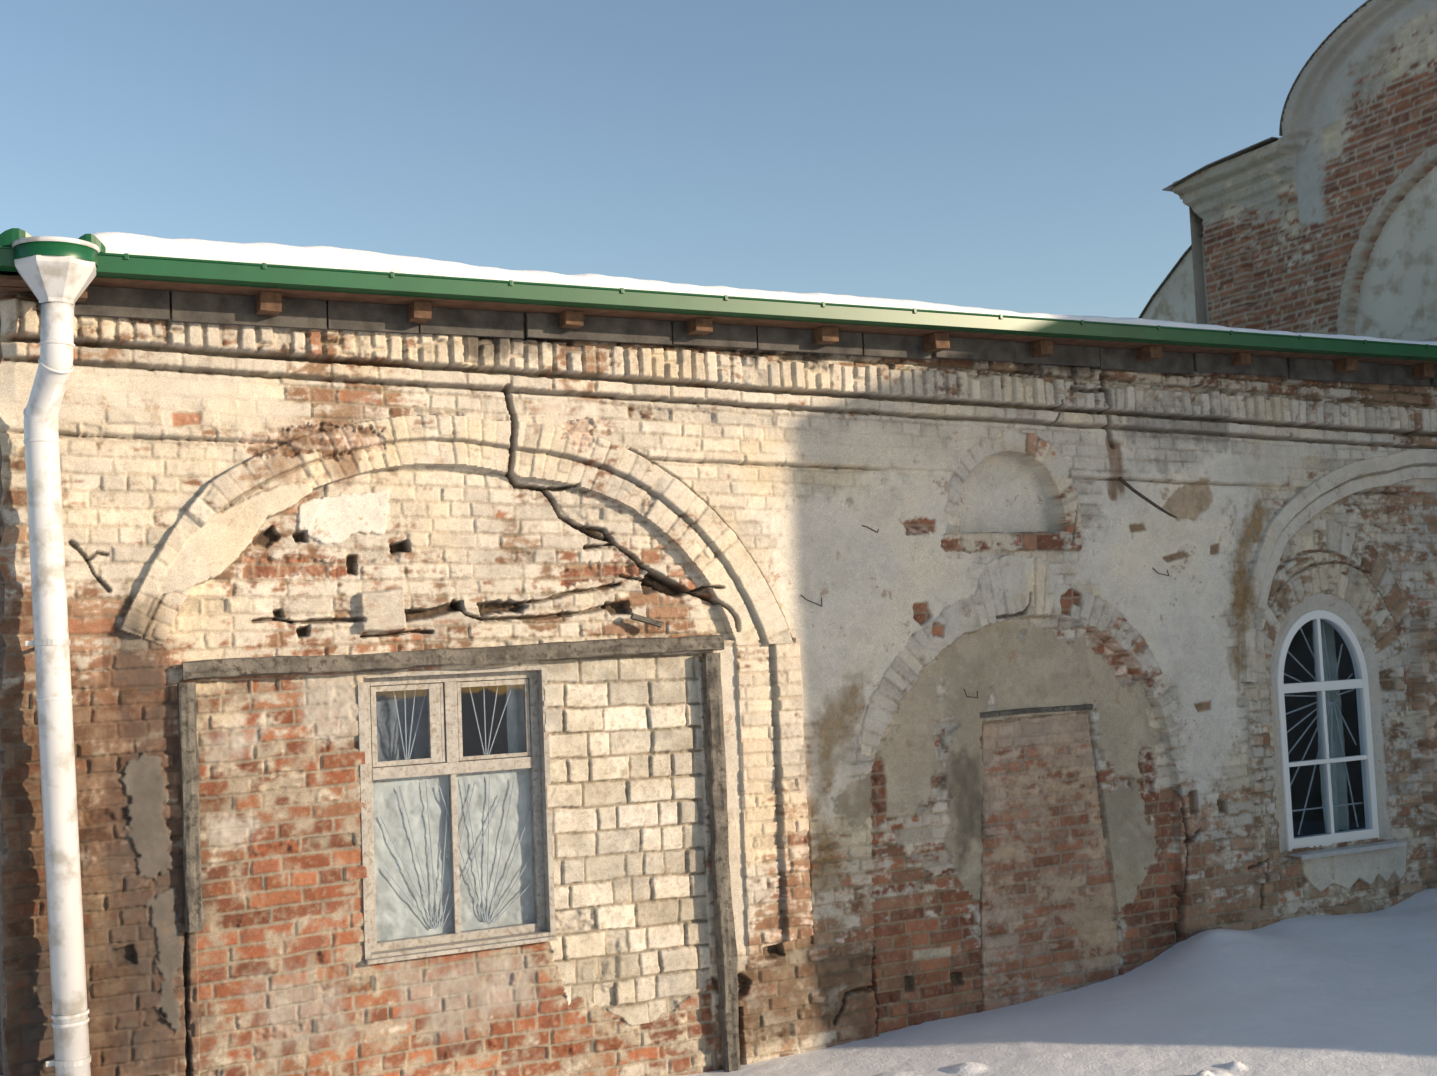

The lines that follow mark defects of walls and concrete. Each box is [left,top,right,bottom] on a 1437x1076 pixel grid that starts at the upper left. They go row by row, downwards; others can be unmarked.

flaking render [242,487,392,583]
crack [251,381,742,639]
flaking render [903,516,958,550]
flaking render [1162,476,1214,522]
spalling [476,598,530,615]
flaking render [559,559,681,615]
spalling [1086,626,1148,687]
damp [820,685,858,781]
spalling [870,756,888,829]
peeling [144,885,184,1036]
spalling [738,972,752,1000]
spalling [762,942,786,959]